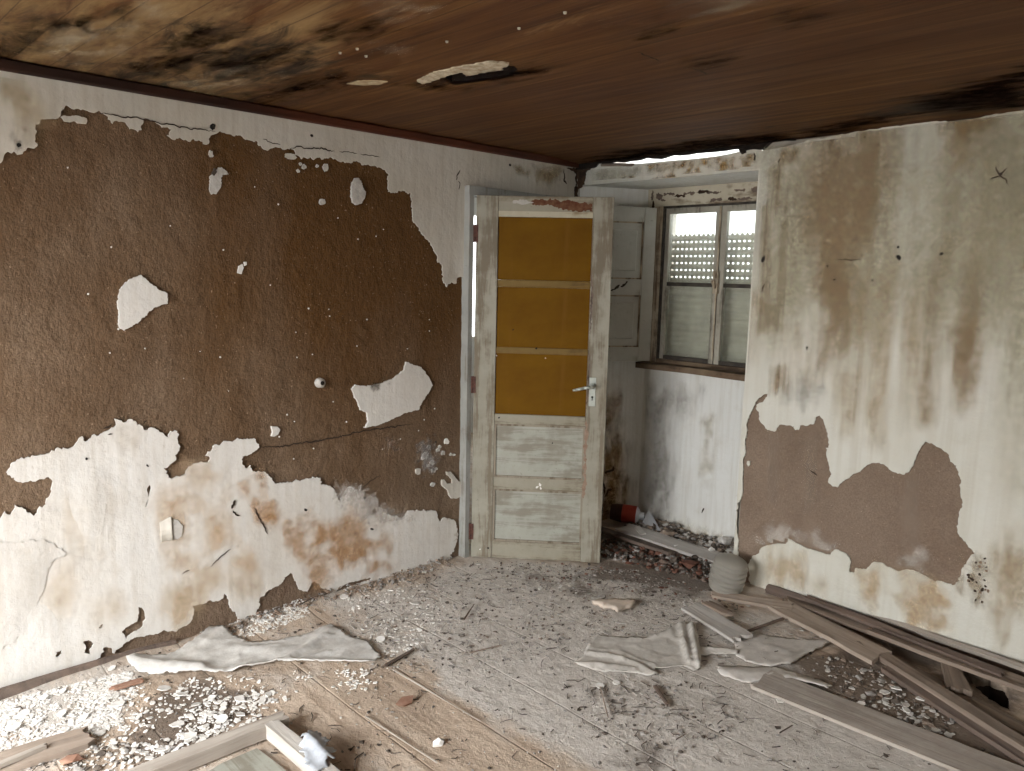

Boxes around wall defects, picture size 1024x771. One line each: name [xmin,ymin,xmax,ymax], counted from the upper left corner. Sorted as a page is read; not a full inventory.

peeling [651,186,757,208]
spalling [0,106,462,557]
spalling [738,394,990,603]